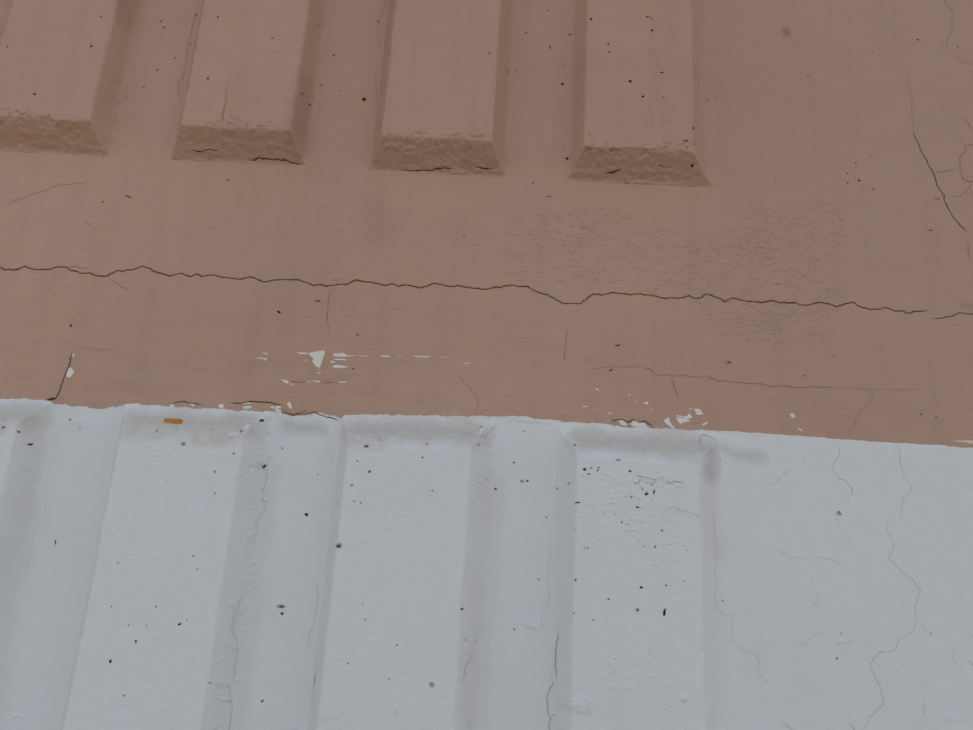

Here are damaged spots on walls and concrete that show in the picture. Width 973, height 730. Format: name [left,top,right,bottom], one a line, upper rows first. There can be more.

crack [251,156,301,164]
crack [404,165,494,173]
crack [907,71,973,255]
crack [0,203,973,344]
peeling [297,351,363,383]
peeling [607,413,648,427]
peeling [664,408,708,429]
crack [778,551,930,730]